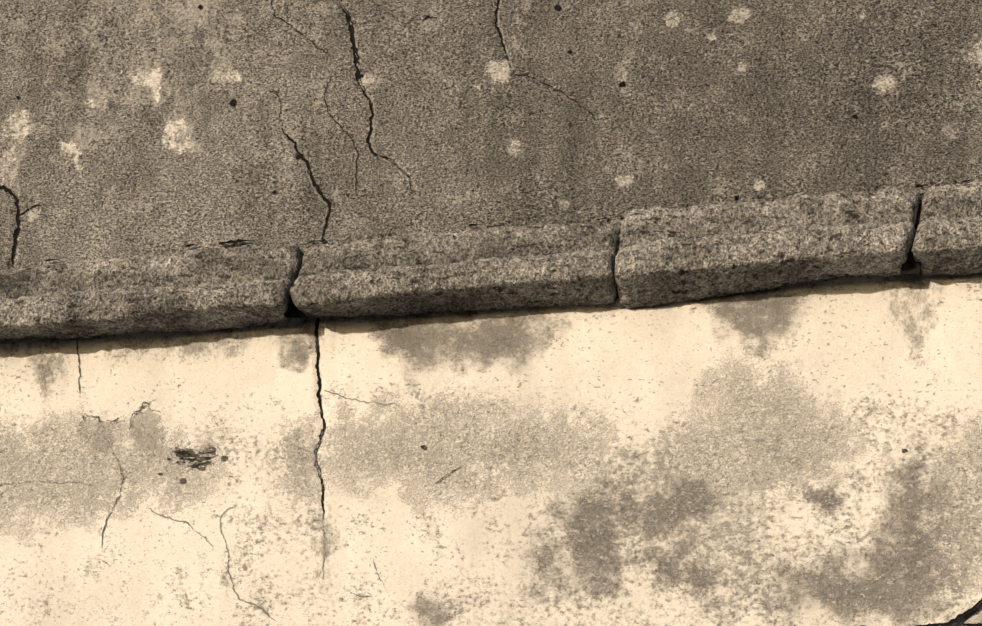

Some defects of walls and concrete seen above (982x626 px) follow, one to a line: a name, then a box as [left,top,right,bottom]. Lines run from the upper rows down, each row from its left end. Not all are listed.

crack [271,0,449,213]
crack [0,185,42,264]
crack [272,89,331,245]
leakage [281,327,311,371]
leakage [373,308,551,365]
leakage [716,289,798,354]
peeling [0,402,230,539]
crack [310,318,399,597]
crack [149,507,277,622]
leakage [530,482,713,597]
leakage [773,460,958,625]
crack [916,599,982,626]